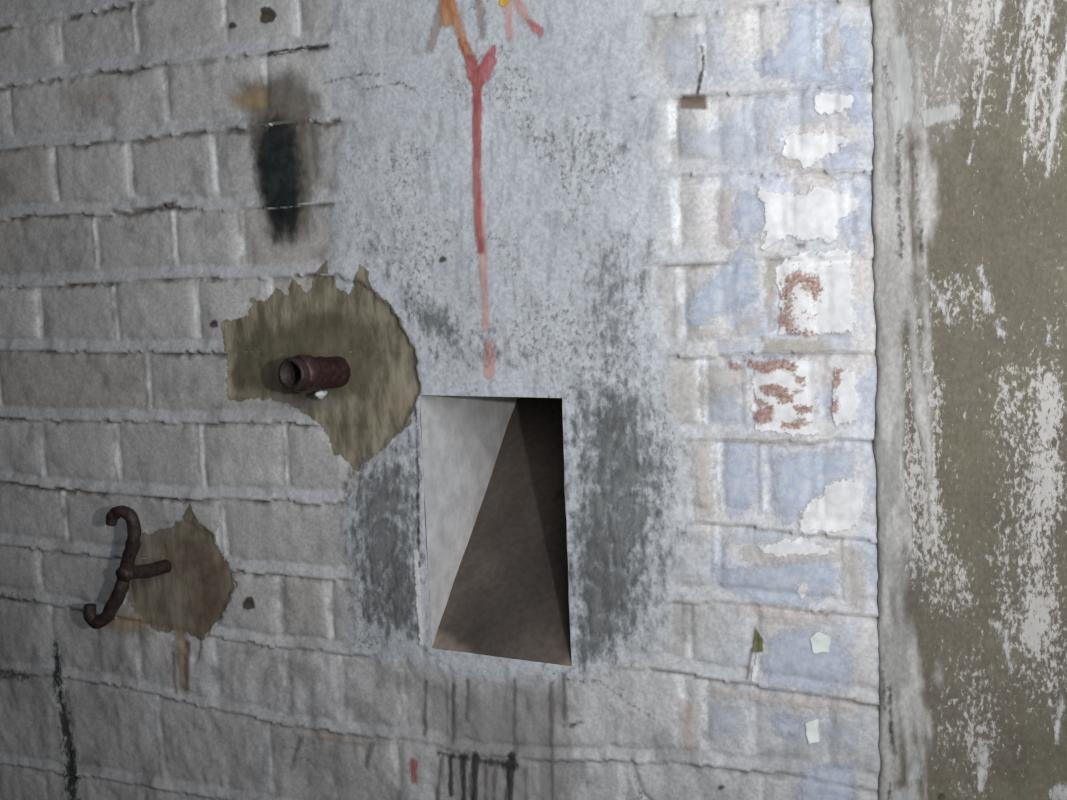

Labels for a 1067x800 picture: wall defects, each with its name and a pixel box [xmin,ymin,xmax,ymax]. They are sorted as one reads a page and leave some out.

peeling [109,504,235,689]
peeling [221,261,421,471]
damp [344,448,423,637]
damp [564,249,669,668]
peeling [673,7,961,800]
damp [436,681,519,800]
damp [550,673,567,794]